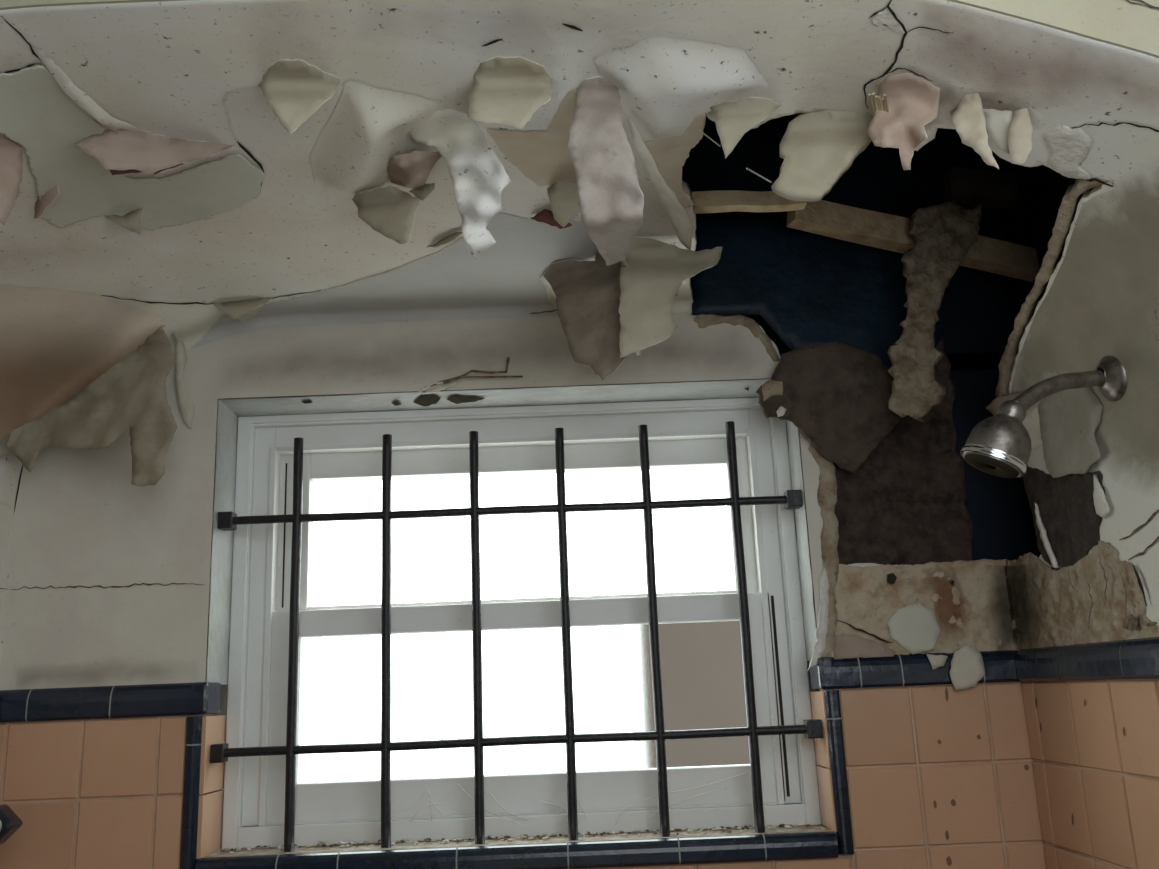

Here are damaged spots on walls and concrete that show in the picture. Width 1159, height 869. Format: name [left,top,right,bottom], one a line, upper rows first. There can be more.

crack [1127,0,1159,9]
crack [1,16,40,73]
crack [863,0,950,109]
spalling [0,56,1159,690]
crack [1119,509,1159,560]
crack [0,582,204,590]